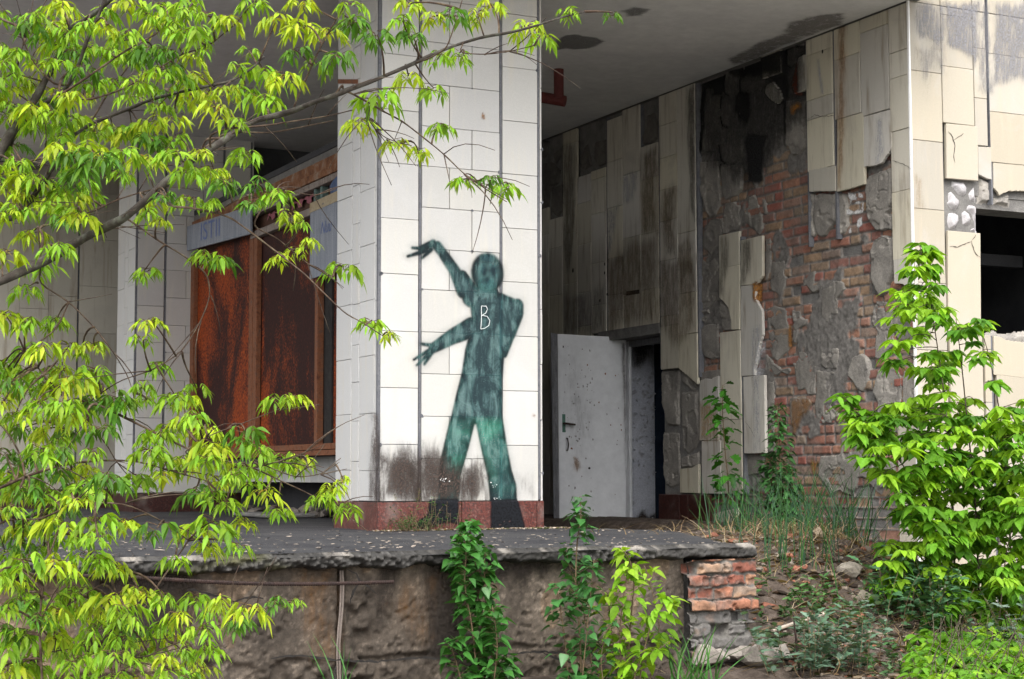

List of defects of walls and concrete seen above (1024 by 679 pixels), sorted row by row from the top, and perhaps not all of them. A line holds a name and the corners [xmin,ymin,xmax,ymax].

water stain [916,4,1024,85]
flaking render [606,14,914,496]
water stain [372,414,486,507]